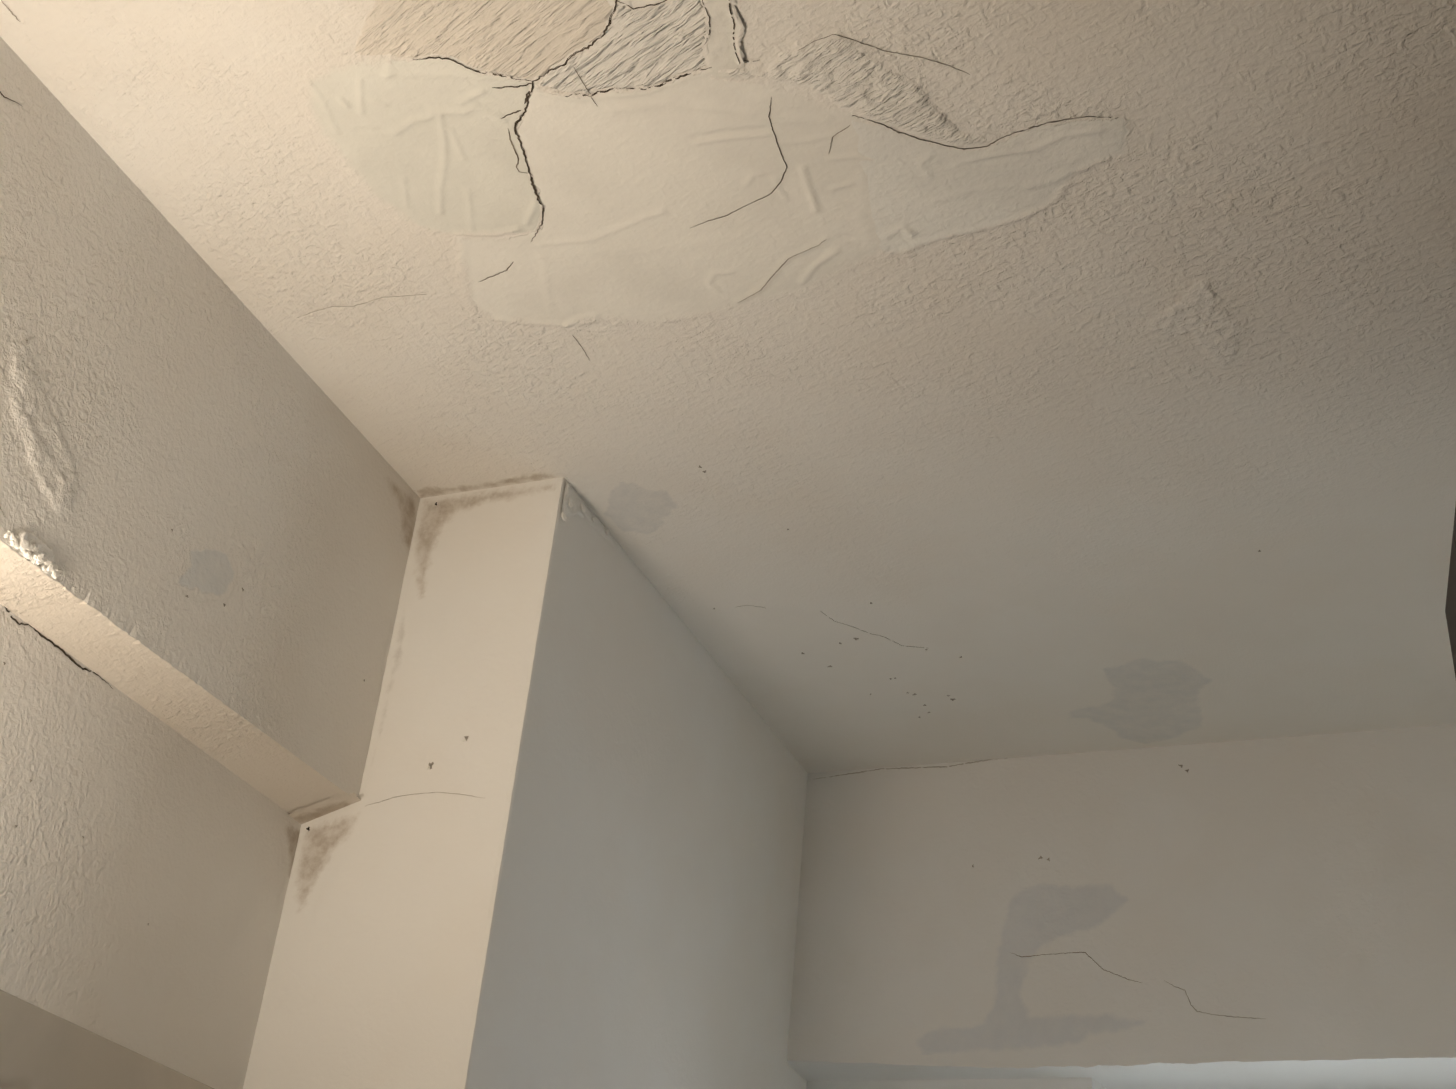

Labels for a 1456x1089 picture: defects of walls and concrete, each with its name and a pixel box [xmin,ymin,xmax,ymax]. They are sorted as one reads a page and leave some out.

crack [799,34,970,75]
crack [413,0,759,282]
crack [691,97,787,228]
crack [297,294,426,318]
flaking render [2,525,65,584]
water stain [280,463,562,927]
water stain [1061,653,1222,748]
water stain [907,875,1158,1055]
crack [1013,952,1261,1019]